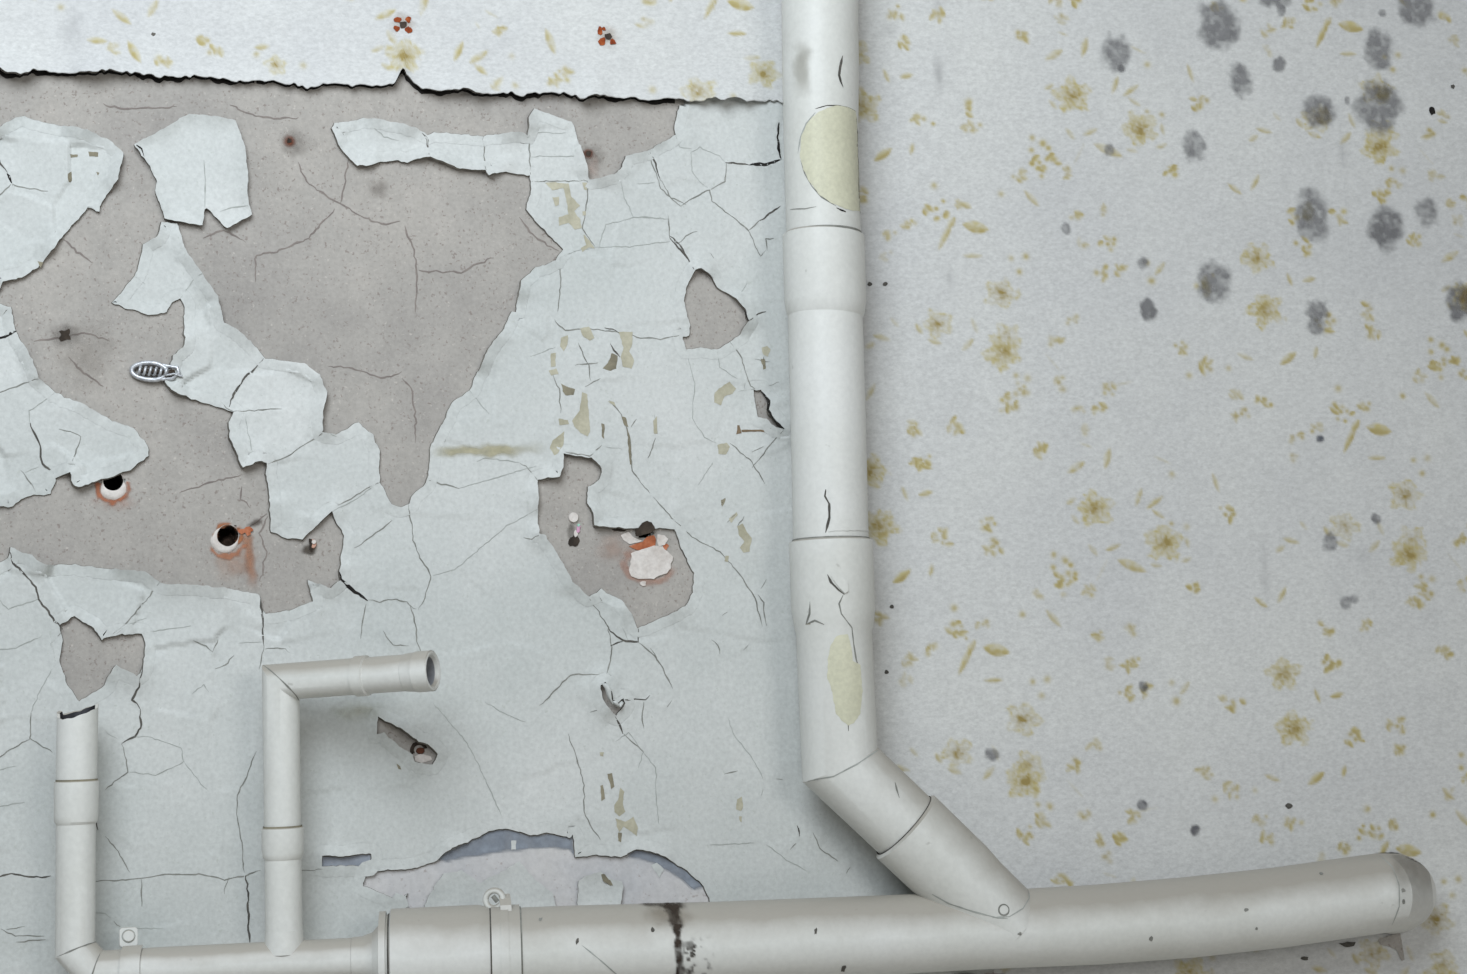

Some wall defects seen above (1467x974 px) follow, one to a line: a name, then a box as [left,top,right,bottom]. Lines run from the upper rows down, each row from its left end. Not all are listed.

water stain [1203,3,1237,45]
water stain [1360,87,1398,129]
peeling [0,67,704,639]
crack [527,123,784,652]
peeling [673,259,791,454]
water stain [1141,299,1157,319]
water stain [1371,212,1401,246]
crack [335,458,539,651]
spalling [721,498,752,562]
peeling [48,605,156,711]
crack [96,667,260,942]
crack [489,600,672,839]